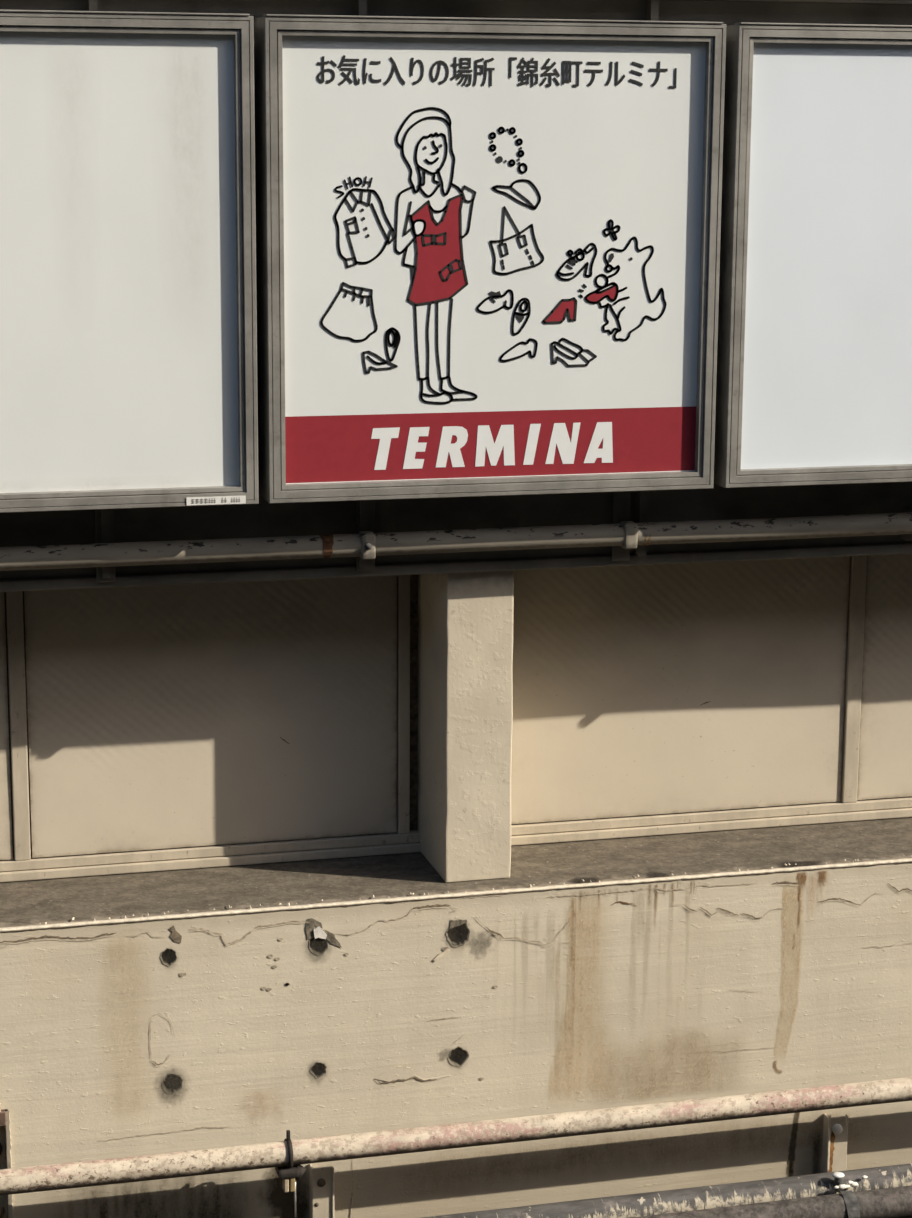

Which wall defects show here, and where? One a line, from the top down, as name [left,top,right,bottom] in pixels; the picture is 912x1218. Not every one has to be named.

crack [0,920,307,948]
spalling [280,899,349,956]
crack [335,881,912,947]
corrosion [783,871,827,953]